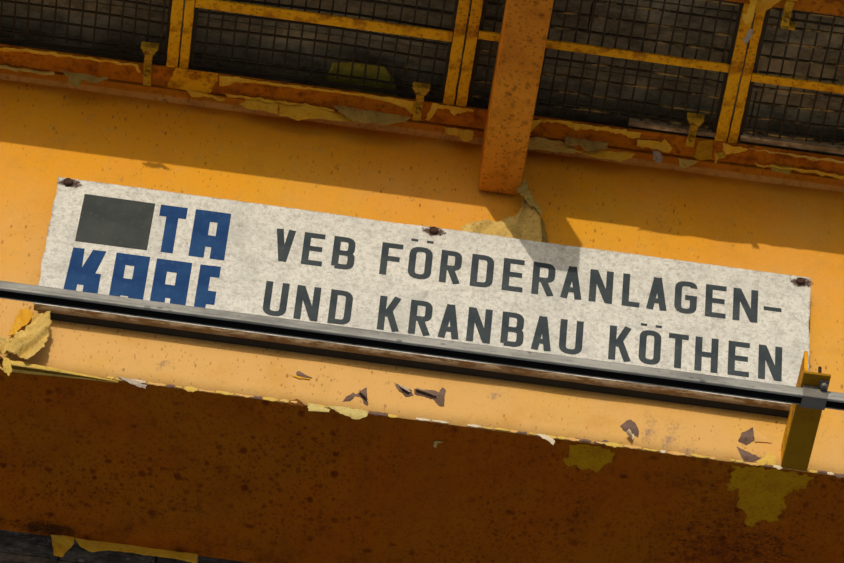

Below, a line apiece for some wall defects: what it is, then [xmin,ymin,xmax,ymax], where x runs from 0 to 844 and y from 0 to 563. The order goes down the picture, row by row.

peeling [742,0,781,43]
peeling [0,65,109,88]
peeling [239,100,411,125]
peeling [528,136,635,162]
peeling [462,179,548,243]
peeling [0,307,398,420]
peeling [395,383,446,407]
peeling [467,420,715,460]
peeling [730,427,792,470]
peeling [50,535,198,563]